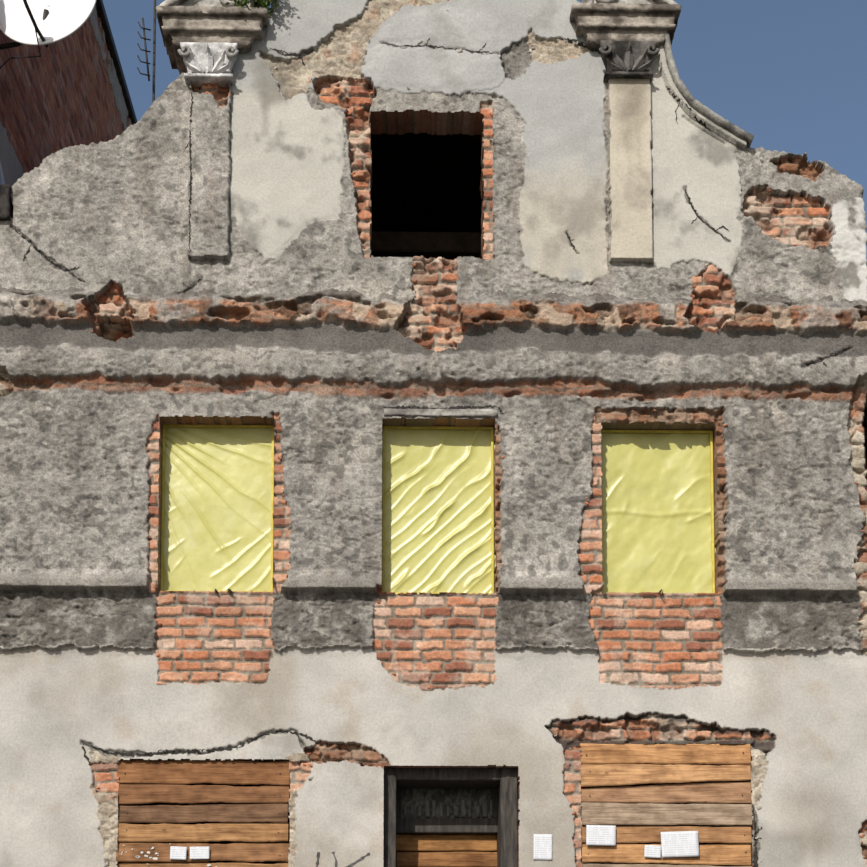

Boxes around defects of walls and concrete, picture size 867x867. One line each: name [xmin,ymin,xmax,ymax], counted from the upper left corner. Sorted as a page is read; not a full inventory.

spalling [260,0,449,258]
crack [12,227,83,282]
spalling [87,283,134,342]
spalling [397,255,468,352]
crack [685,188,729,239]
spalling [742,185,836,250]
spalling [146,414,292,686]
spalling [373,423,505,691]
spalling [578,407,731,690]
spalling [87,748,121,867]
spalling [286,741,391,867]
spalling [545,713,777,867]